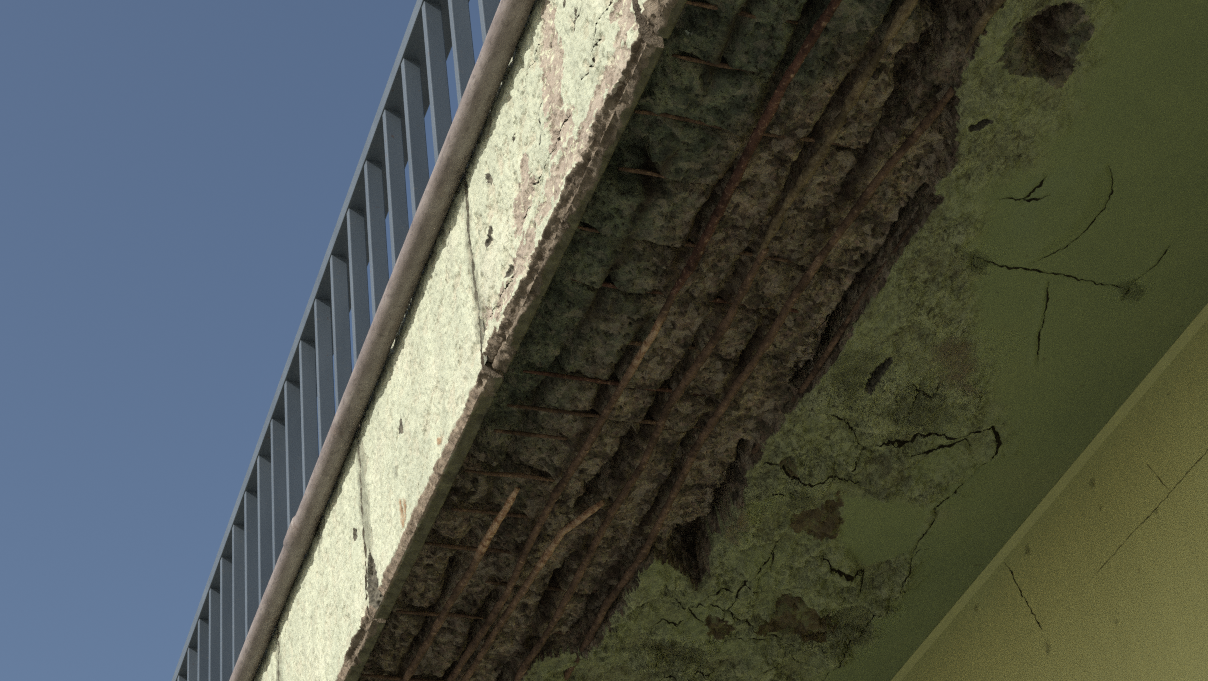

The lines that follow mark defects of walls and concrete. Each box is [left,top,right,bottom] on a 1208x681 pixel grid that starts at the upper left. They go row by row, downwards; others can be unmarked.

spalling [996,0,1095,89]
spalling [344,0,1006,681]
crack [914,384,939,401]
crack [971,169,1170,360]